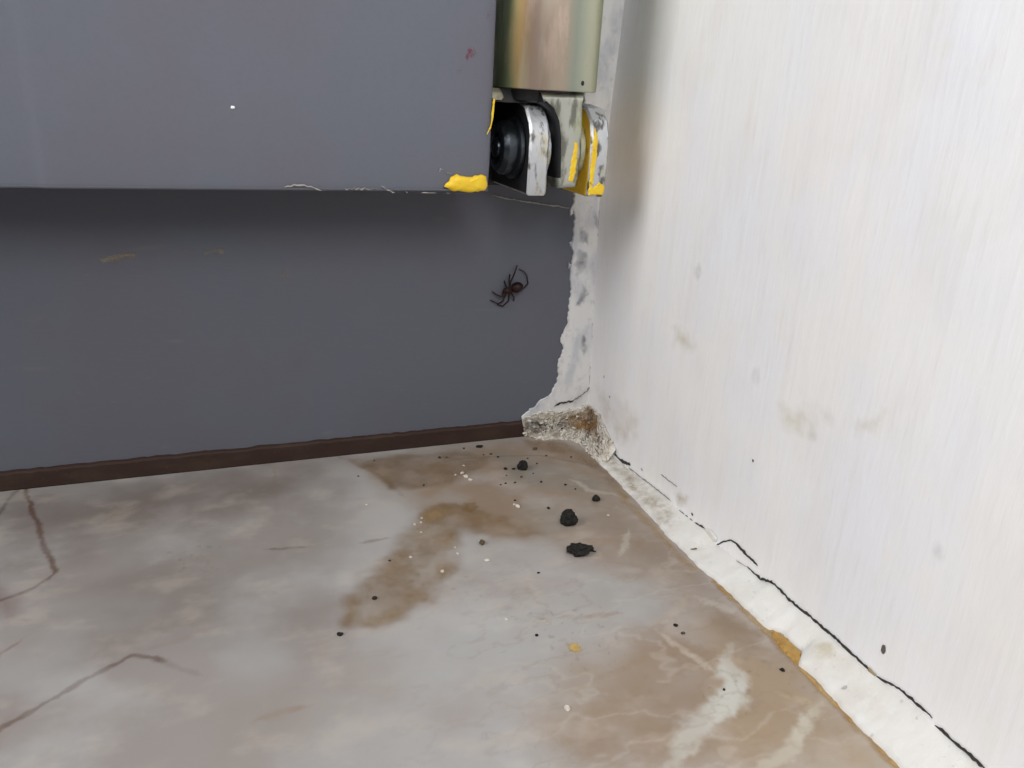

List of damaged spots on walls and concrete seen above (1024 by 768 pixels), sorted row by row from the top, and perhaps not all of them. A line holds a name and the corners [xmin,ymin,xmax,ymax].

peeling [584,0,625,128]
peeling [521,193,616,463]
crack [614,454,985,768]